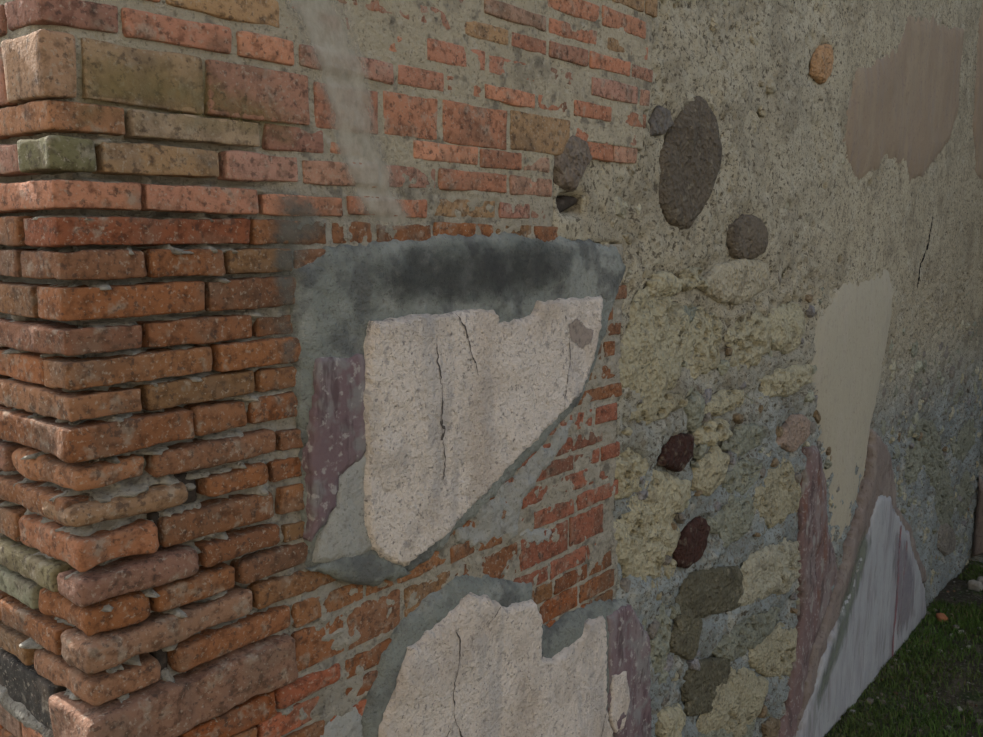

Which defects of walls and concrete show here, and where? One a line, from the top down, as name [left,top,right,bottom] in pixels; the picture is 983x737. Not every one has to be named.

spalling [556,196,577,213]
crack [455,313,478,372]
crack [436,346,446,479]
peeling [289,231,626,587]
crack [447,632,463,737]